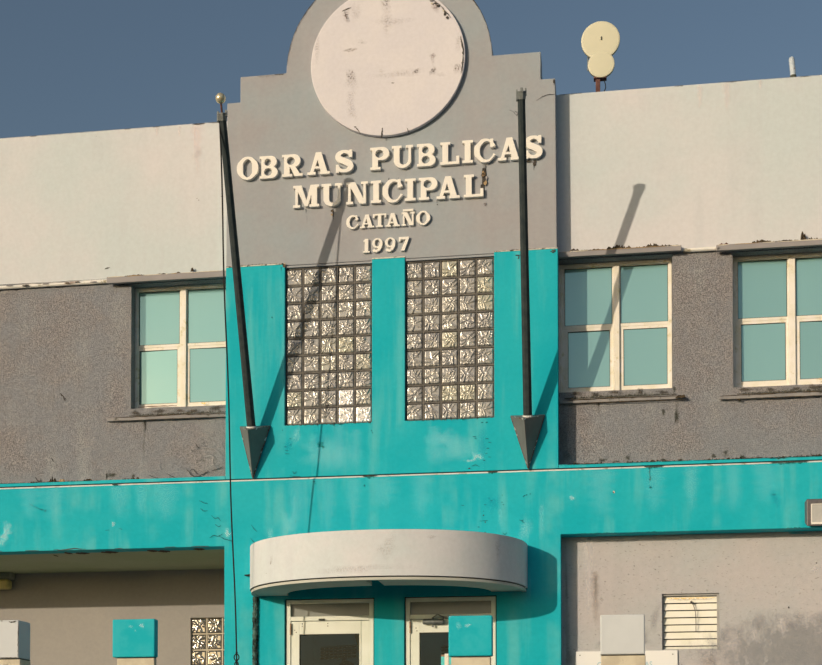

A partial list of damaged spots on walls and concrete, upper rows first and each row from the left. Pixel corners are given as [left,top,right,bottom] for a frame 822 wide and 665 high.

damp [568,451,822,488]
damp [723,623,822,665]